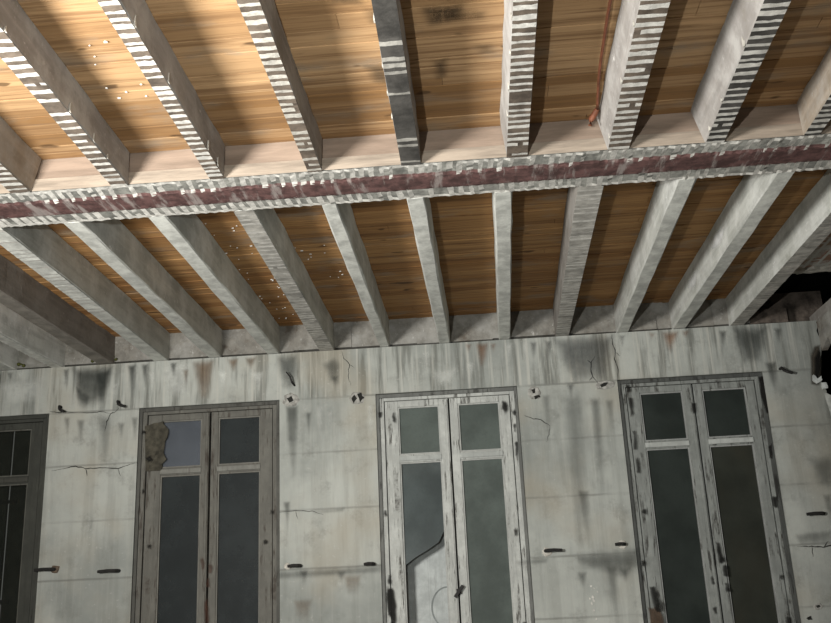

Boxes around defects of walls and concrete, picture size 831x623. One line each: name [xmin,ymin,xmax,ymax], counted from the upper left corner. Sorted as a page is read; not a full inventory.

spalling [811,346,820,384]
damp [78,371,107,395]
crack [50,408,119,429]
crack [54,463,134,476]